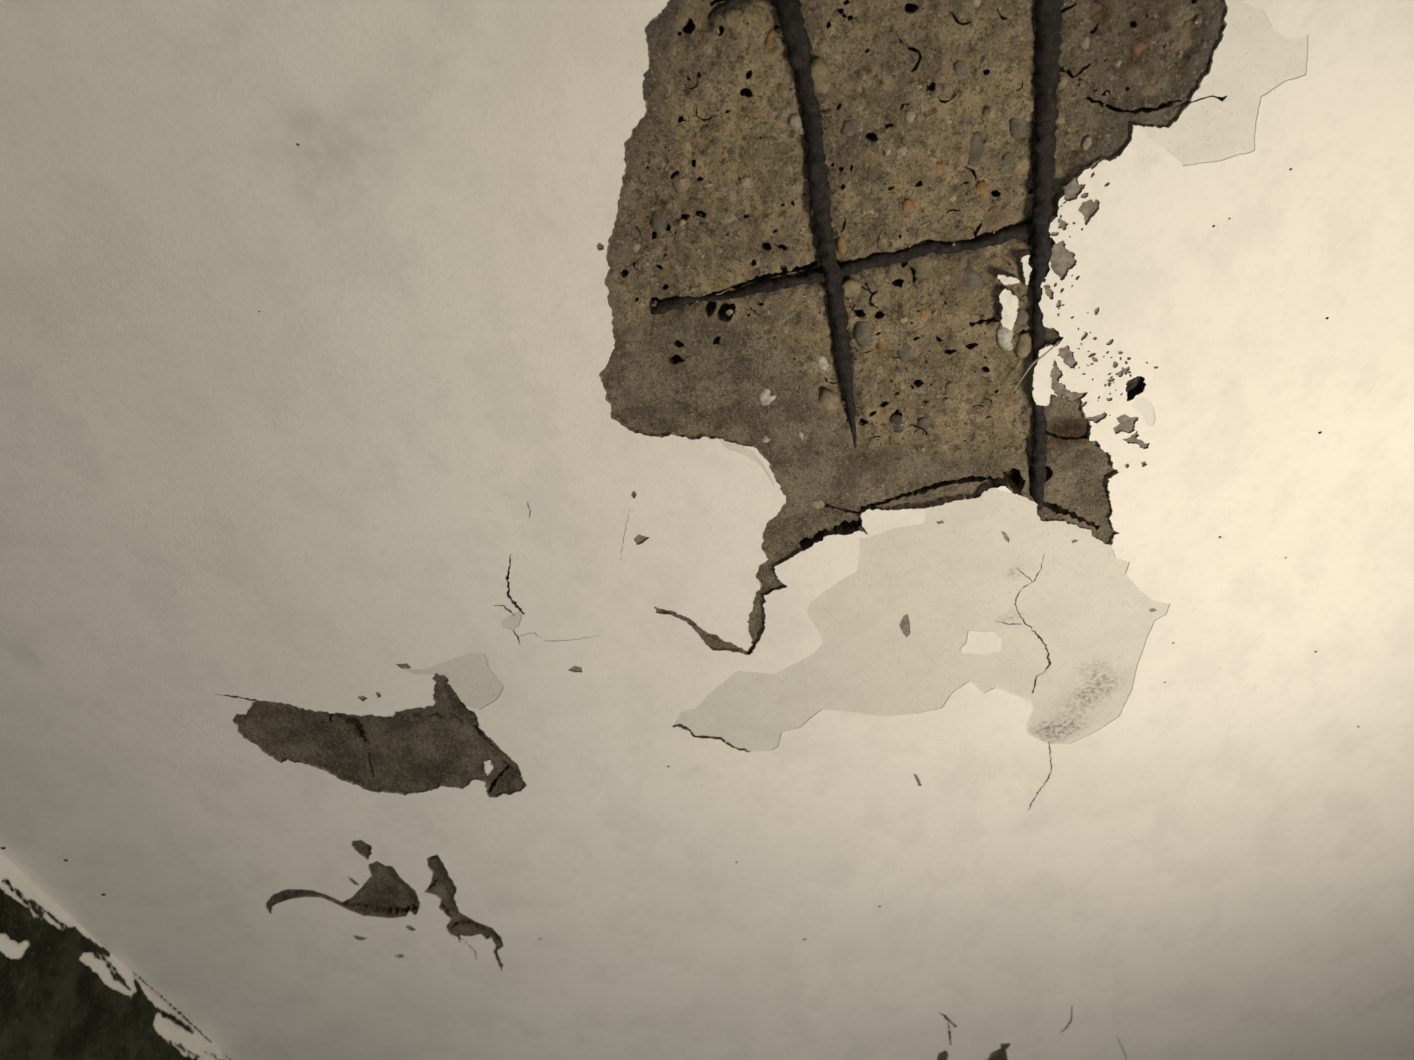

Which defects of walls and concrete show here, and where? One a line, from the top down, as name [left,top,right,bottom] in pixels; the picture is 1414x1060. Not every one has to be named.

spalling [597,0,1308,752]
crack [493,556,594,644]
crack [997,553,1051,693]
spalling [233,653,527,798]
crack [1028,741,1053,810]
spalling [266,839,503,971]
spalling [987,1043,1011,1060]